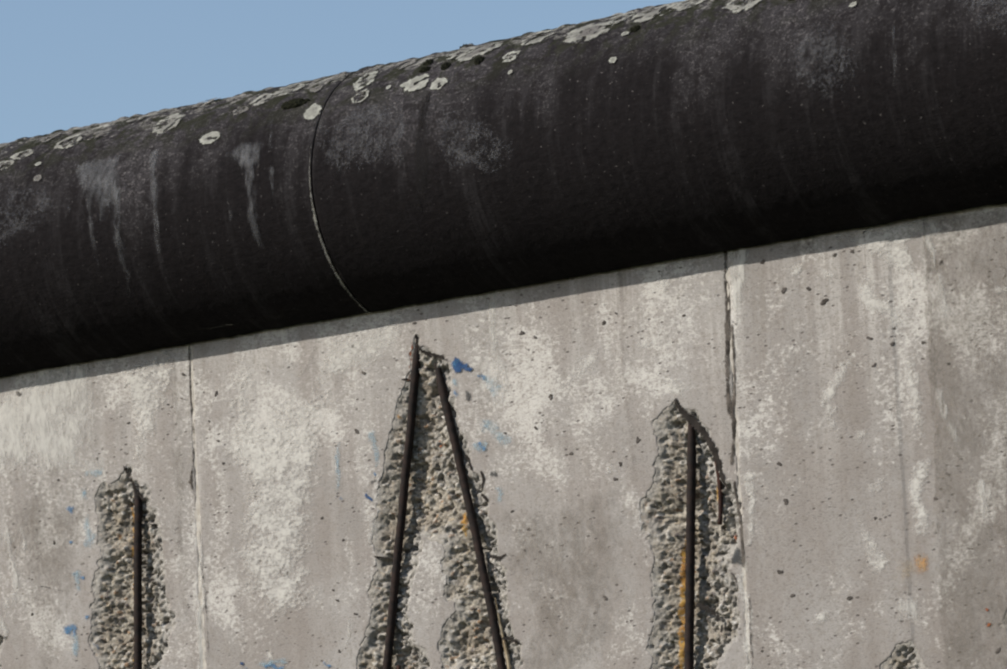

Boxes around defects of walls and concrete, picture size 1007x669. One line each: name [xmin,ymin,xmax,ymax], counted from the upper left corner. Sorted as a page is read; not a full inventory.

spalling [89,465,176,669]
spalling [357,331,523,669]
rust [678,540,686,669]
spalling [640,400,742,669]
crack [674,251,753,664]